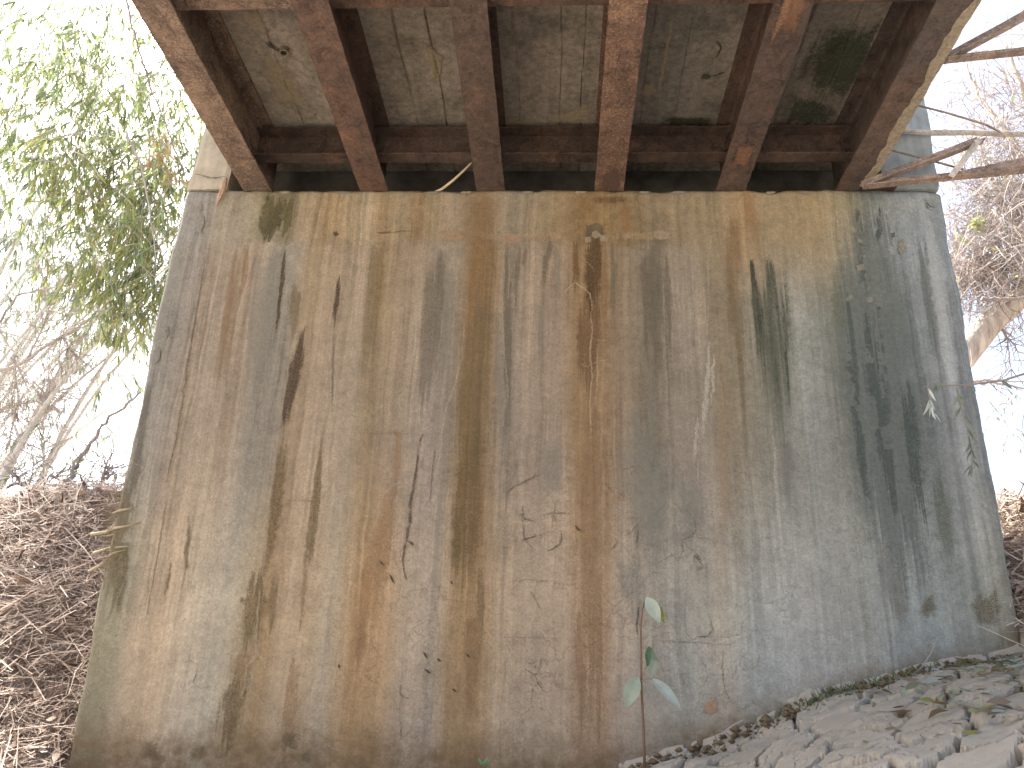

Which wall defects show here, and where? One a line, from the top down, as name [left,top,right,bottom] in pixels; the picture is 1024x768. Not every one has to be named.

mould [785,14,887,125]
leakage [214,198,305,759]
crack [435,442,581,558]
leakage [734,261,799,511]
leakage [811,194,956,632]